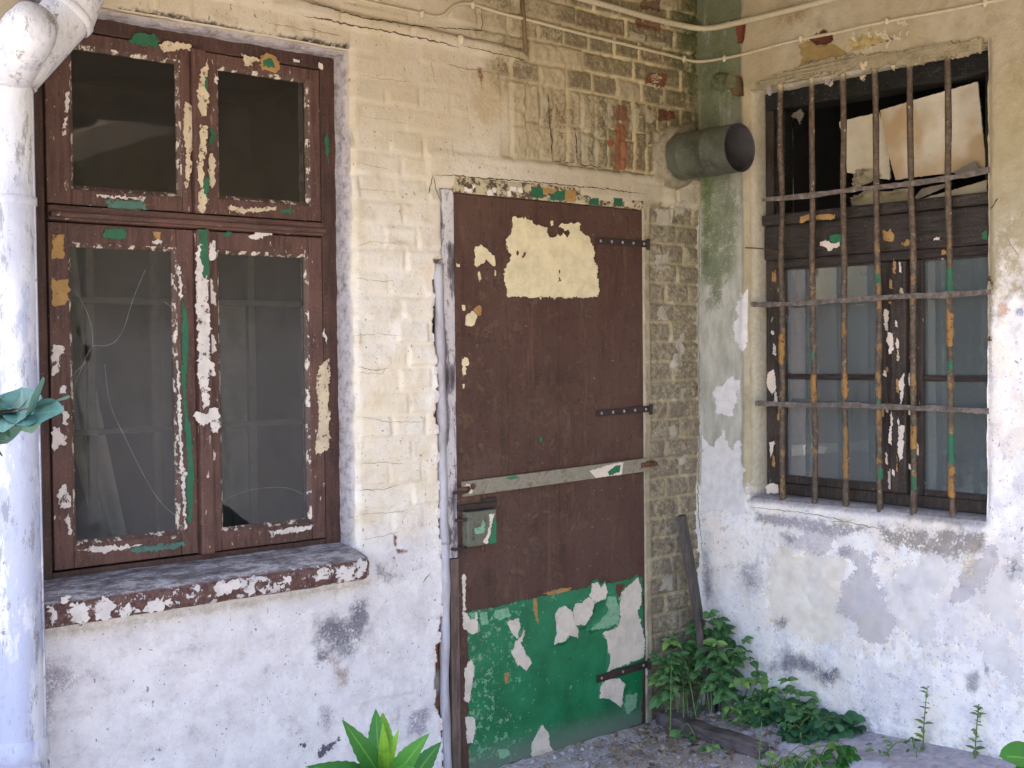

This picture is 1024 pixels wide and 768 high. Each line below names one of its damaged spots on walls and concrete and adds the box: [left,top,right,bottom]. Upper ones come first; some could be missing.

crack [266,3,530,82]
flaking render [711,20,984,96]
crack [429,95,646,198]
peeling [578,72,675,170]
peeling [732,289,748,351]
peeling [701,376,749,515]
peeling [765,483,779,494]
peeling [947,433,955,498]
water stain [318,602,368,659]